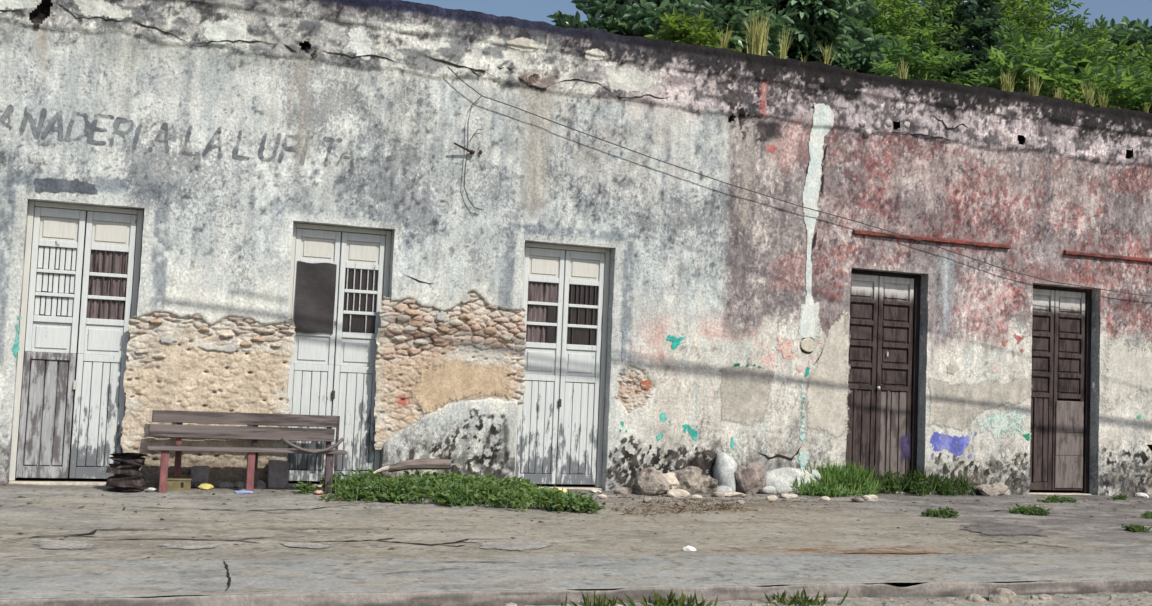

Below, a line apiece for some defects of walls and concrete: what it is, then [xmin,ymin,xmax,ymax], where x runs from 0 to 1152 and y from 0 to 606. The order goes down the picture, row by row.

crack [56,3,281,44]
crack [317,48,515,76]
peeling [667,334,684,350]
flaking render [120,312,296,487]
flaking render [374,293,527,450]
flaking render [615,330,656,433]
peeling [657,413,698,441]
water stain [605,434,718,488]
water stain [1102,448,1152,496]